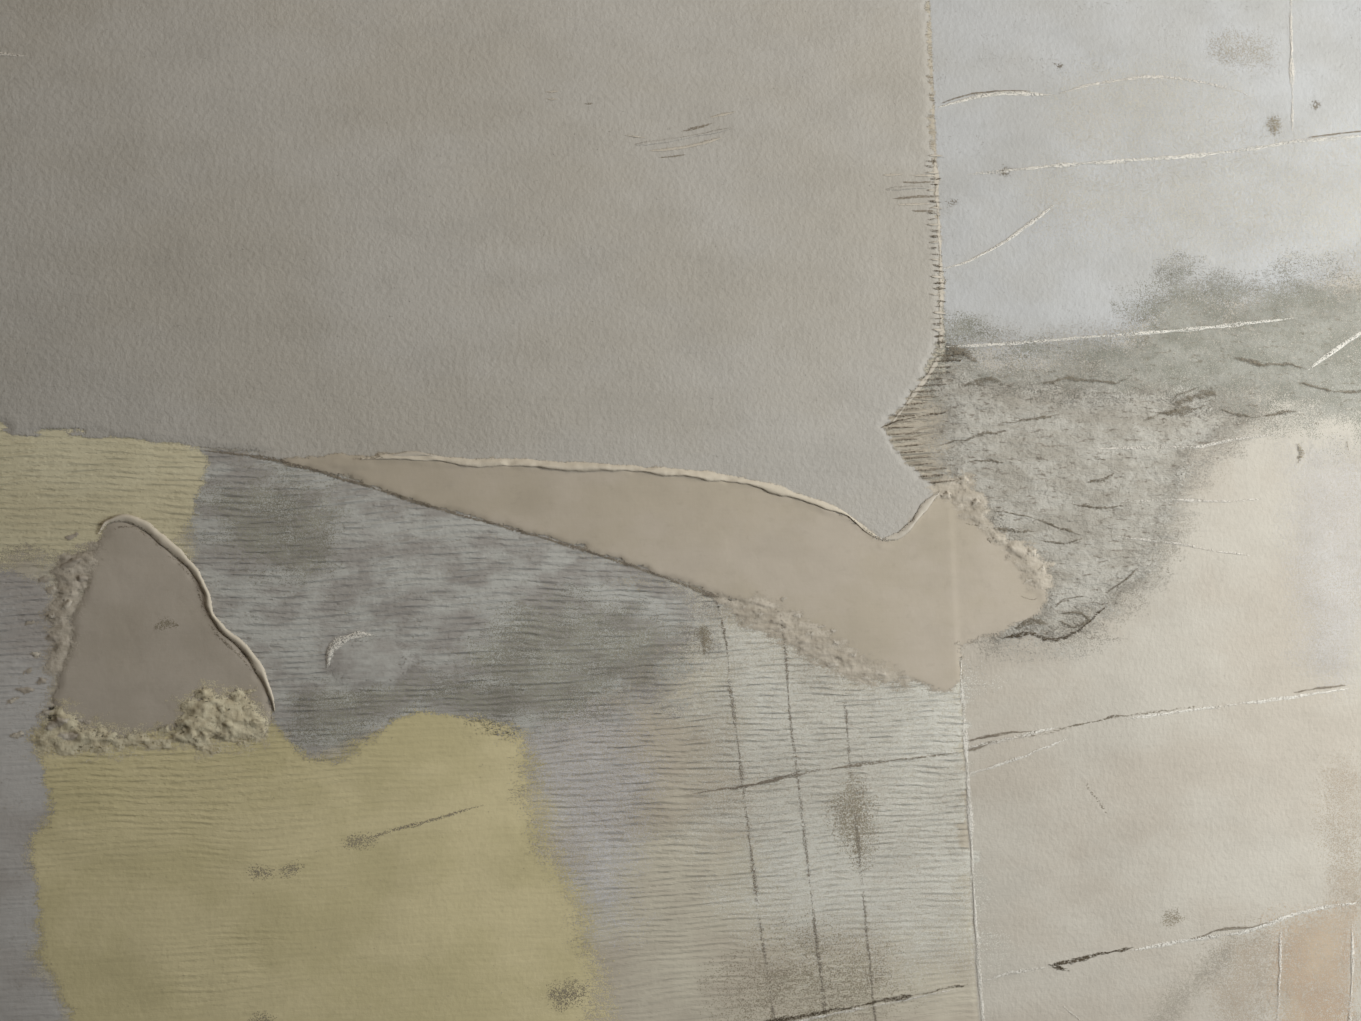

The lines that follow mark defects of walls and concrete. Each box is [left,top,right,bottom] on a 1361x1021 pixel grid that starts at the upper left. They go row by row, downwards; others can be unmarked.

water stain [920,108,1361,463]
spalling [6,532,280,772]
spalling [707,590,916,692]
crack [688,685,1349,795]
crack [766,902,1359,1021]